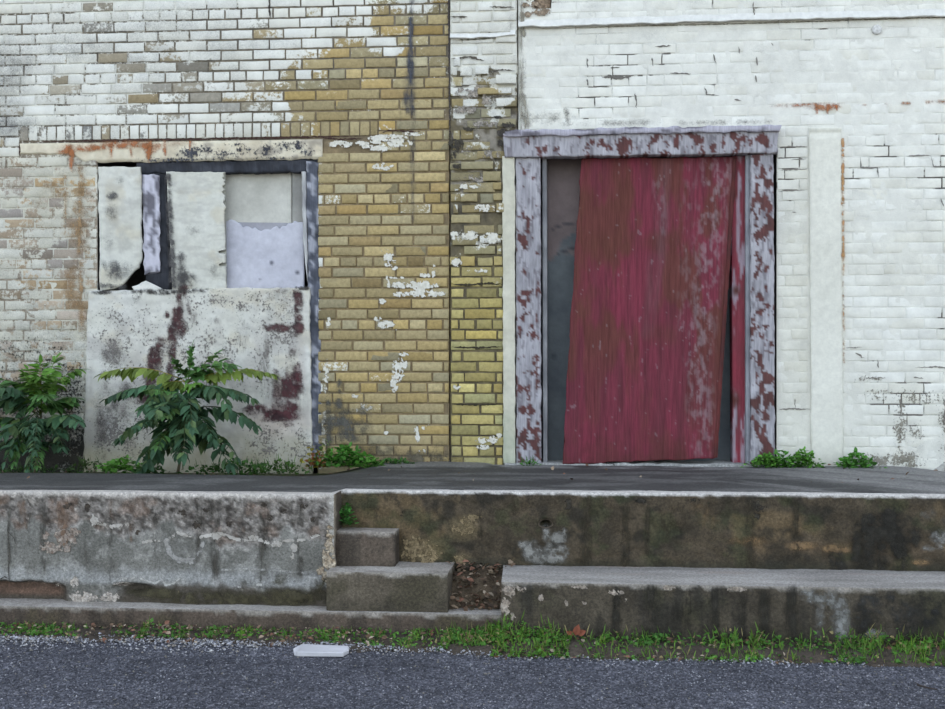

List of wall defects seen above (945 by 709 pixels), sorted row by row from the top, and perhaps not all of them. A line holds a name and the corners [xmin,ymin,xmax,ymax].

crack [18,130,420,156]
crack [447,0,519,140]
crack [543,2,945,108]
rust [793,103,839,114]
rust [44,141,166,254]
rust [65,268,86,330]
peeling [285,57,516,470]
damp [859,375,945,467]
spalling [39,527,81,554]
flaking render [84,504,336,583]
damp [119,501,325,606]
damp [519,526,567,563]